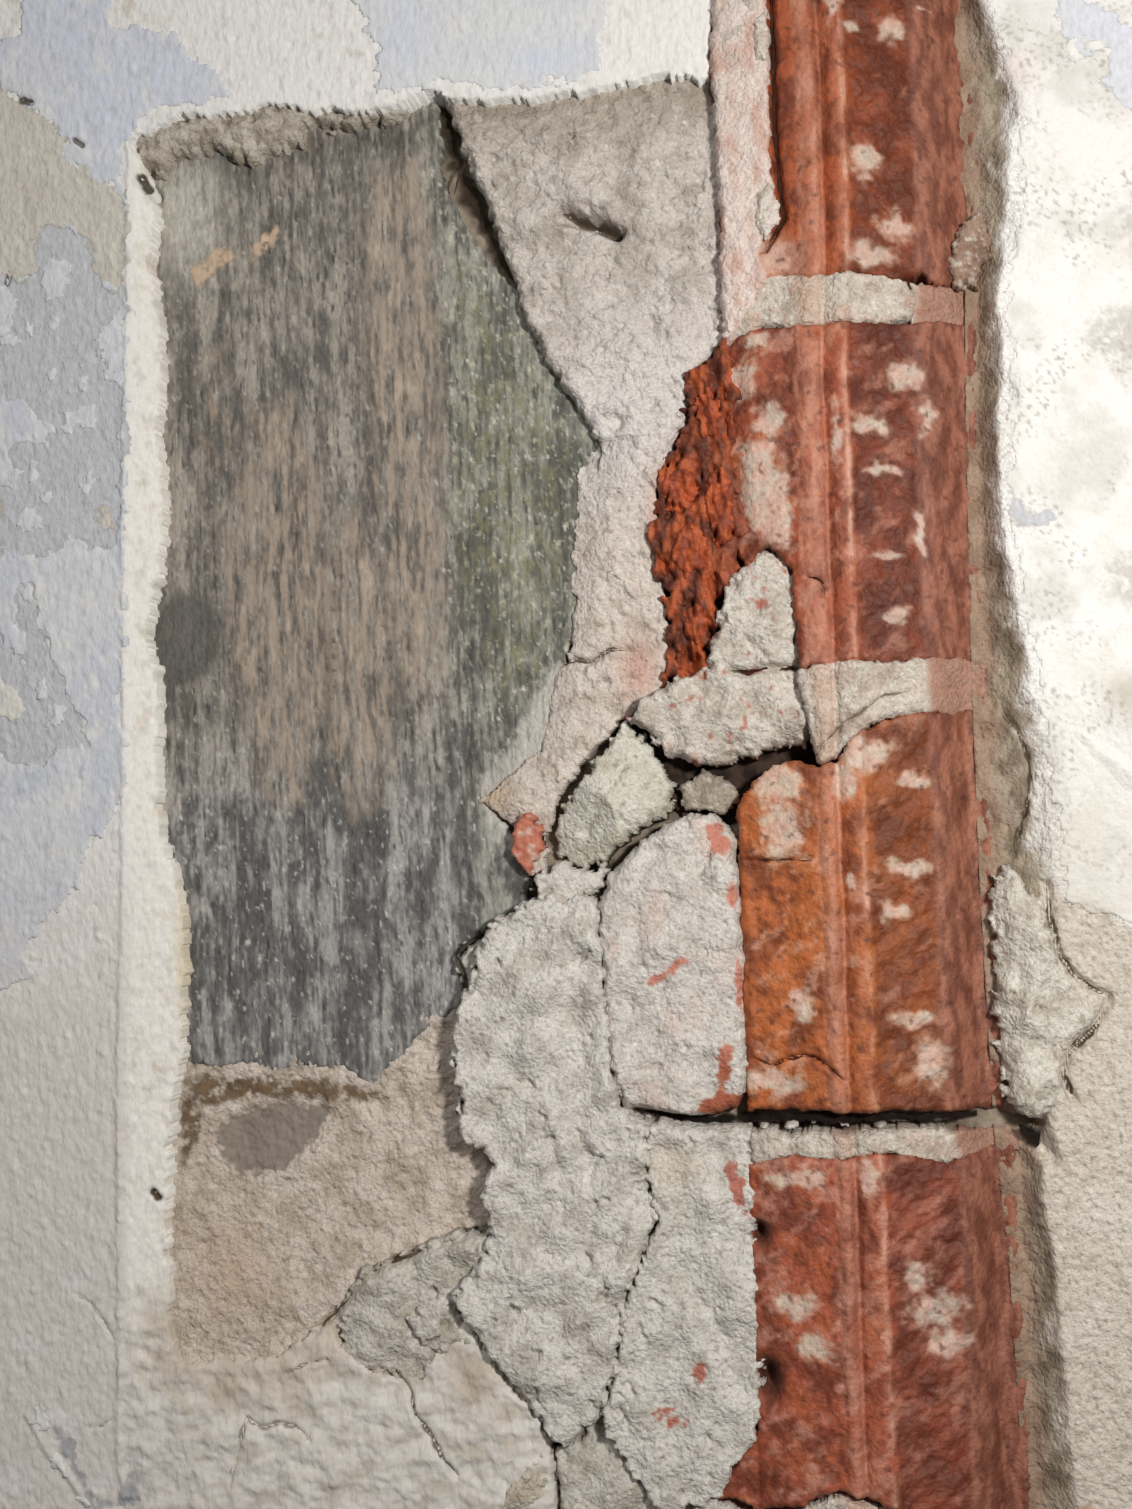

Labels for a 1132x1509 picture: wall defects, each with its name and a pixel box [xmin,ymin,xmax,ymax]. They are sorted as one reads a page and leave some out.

spalling [947,213,995,293]
crack [564,647,627,665]
crack [733,666,796,676]
peeling [0,0,781,1509]
spalling [649,740,817,824]
crack [820,691,906,747]
crack [1001,713,1032,848]
crack [757,856,811,864]
crack [454,912,515,988]
crack [636,1054,977,1125]
crack [1019,1124,1041,1148]